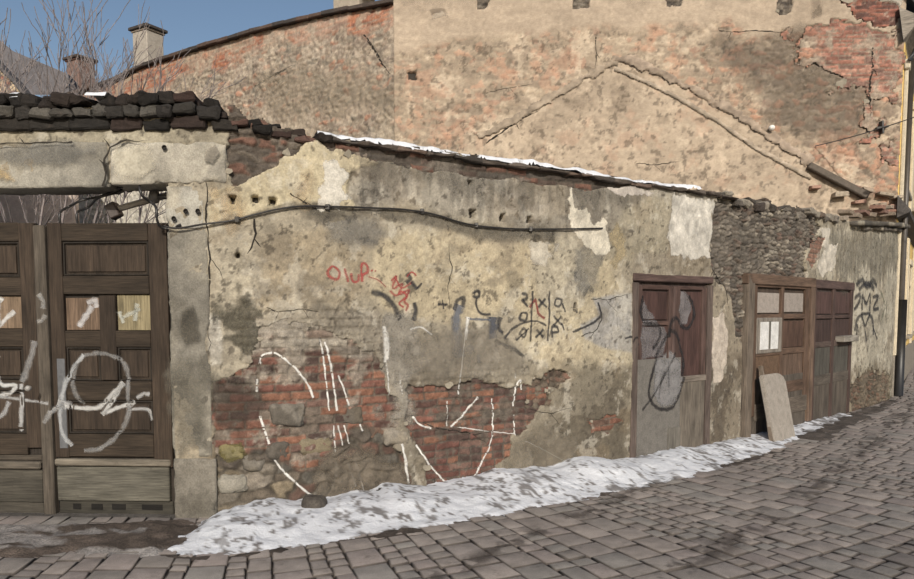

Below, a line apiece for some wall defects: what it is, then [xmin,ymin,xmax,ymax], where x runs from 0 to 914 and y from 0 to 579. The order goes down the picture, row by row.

crack [363,35,390,74]
flaking render [781,0,906,172]
crack [0,137,73,145]
crack [99,139,145,187]
flaking render [403,369,571,485]